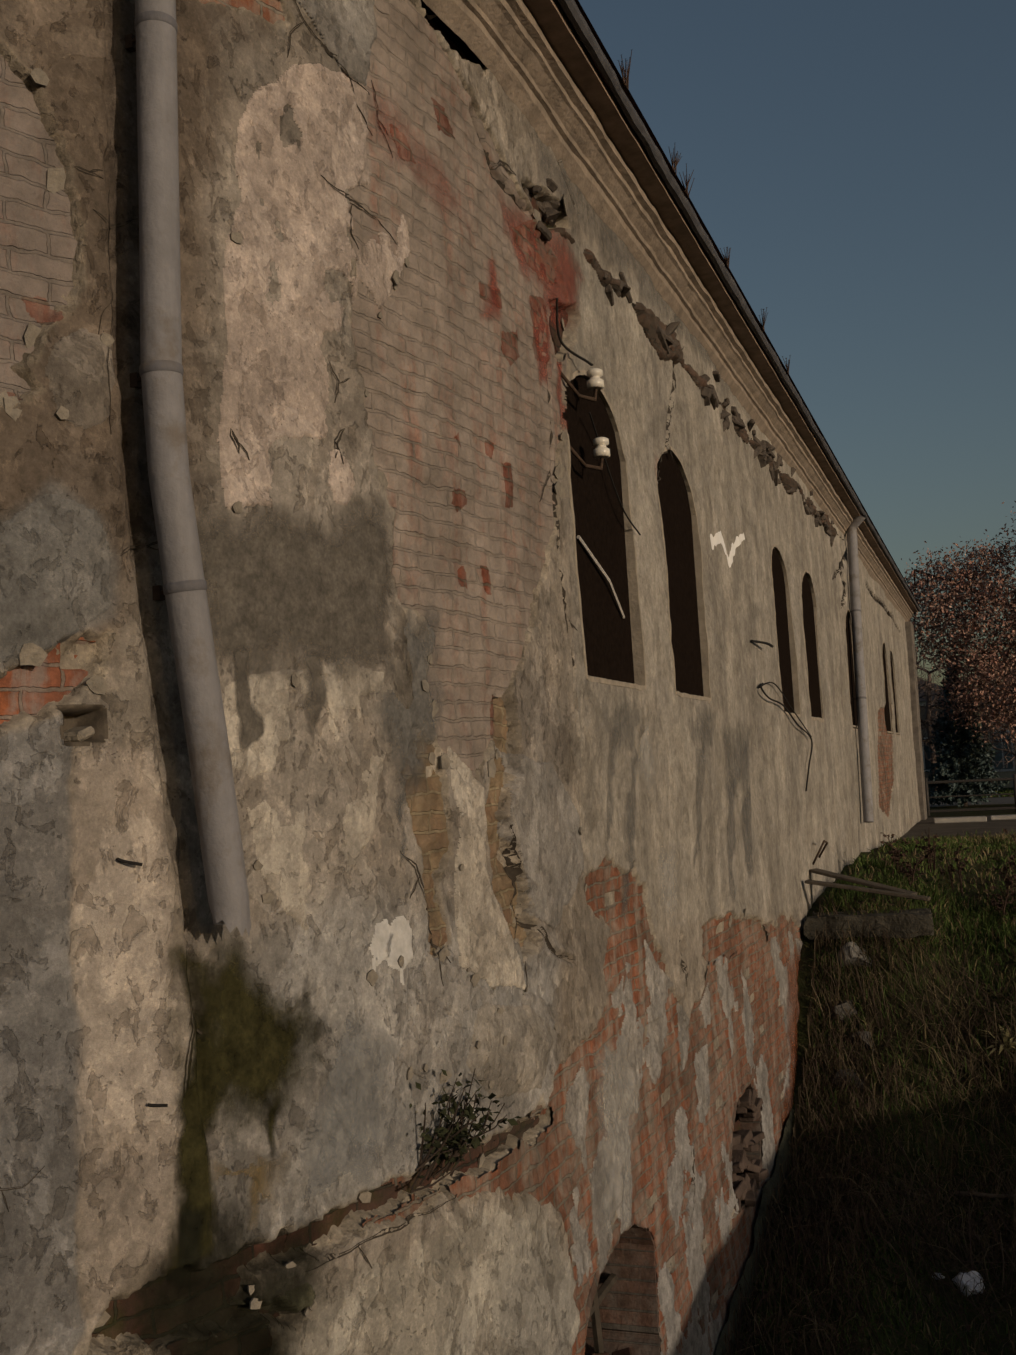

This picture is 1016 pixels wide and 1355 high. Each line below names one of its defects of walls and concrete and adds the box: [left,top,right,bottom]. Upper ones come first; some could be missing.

flaking render [0,54,77,421]
flaking render [0,637,108,746]
flaking render [199,0,803,1355]
crack [0,1166,45,1212]
flaking render [92,1290,165,1345]
damp [139,947,318,1355]